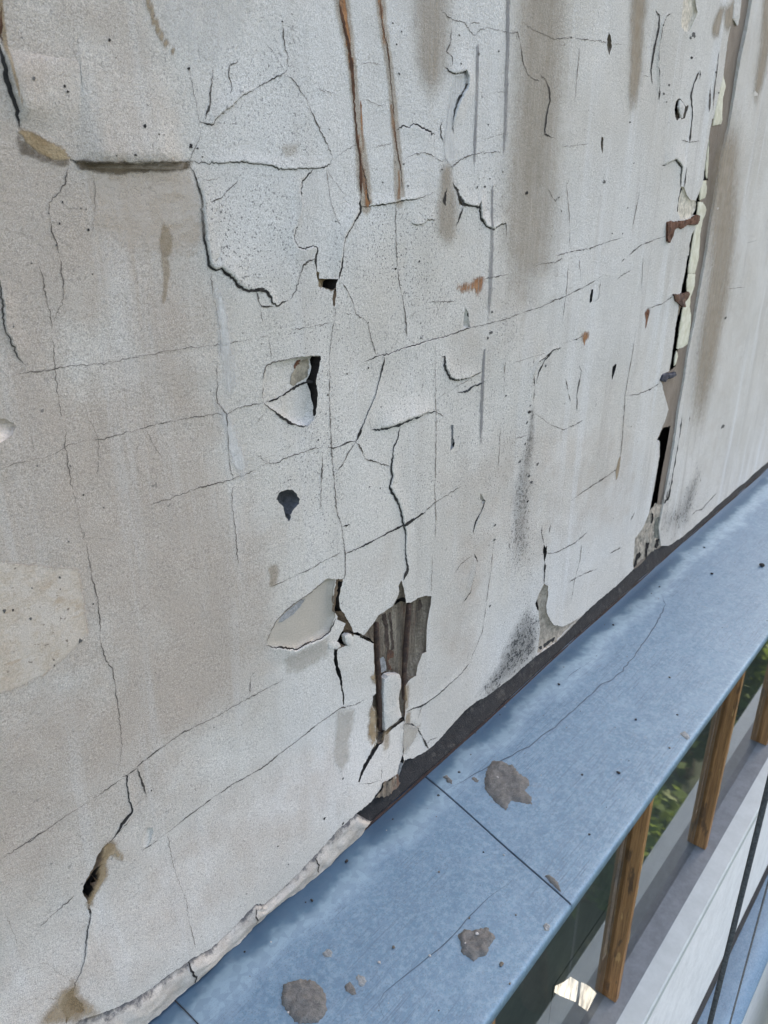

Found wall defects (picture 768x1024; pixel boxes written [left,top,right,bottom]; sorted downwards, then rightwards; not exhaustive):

corrosion [340,0,354,76]
crack [662,55,719,186]
spalling [262,355,329,427]
crack [0,2,672,908]
crack [664,418,690,503]
hole [276,490,300,521]
flaking render [633,503,663,567]
spalling [266,578,336,649]
spalling [360,581,432,744]
hole [82,843,108,904]
crack [39,896,99,999]
crack [188,929,198,983]